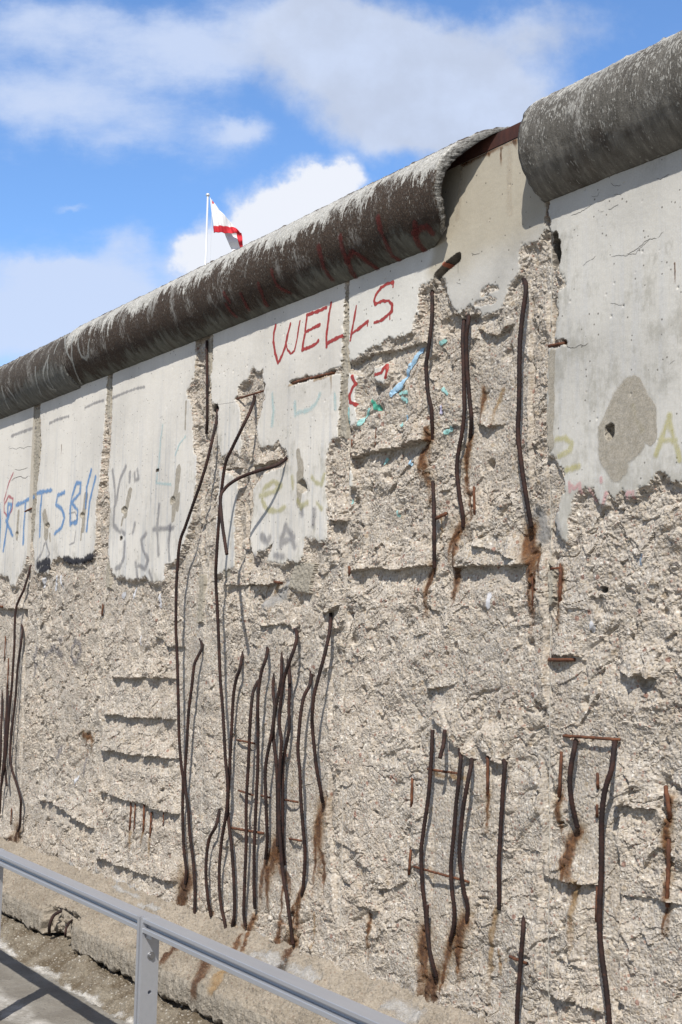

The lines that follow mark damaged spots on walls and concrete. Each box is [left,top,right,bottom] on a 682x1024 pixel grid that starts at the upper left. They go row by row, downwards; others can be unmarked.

corrosion [418,426,431,485]
corrosion [441,436,473,598]
spalling [99,201,682,1024]
corrosion [425,566,436,606]
corrosion [521,524,541,615]
spalling [0,412,185,905]
corrosion [177,872,193,906]
corrosion [233,915,256,951]
corrosion [259,839,302,969]
corrosion [313,801,326,882]
corrosion [418,916,468,1003]
corrosion [555,795,582,923]